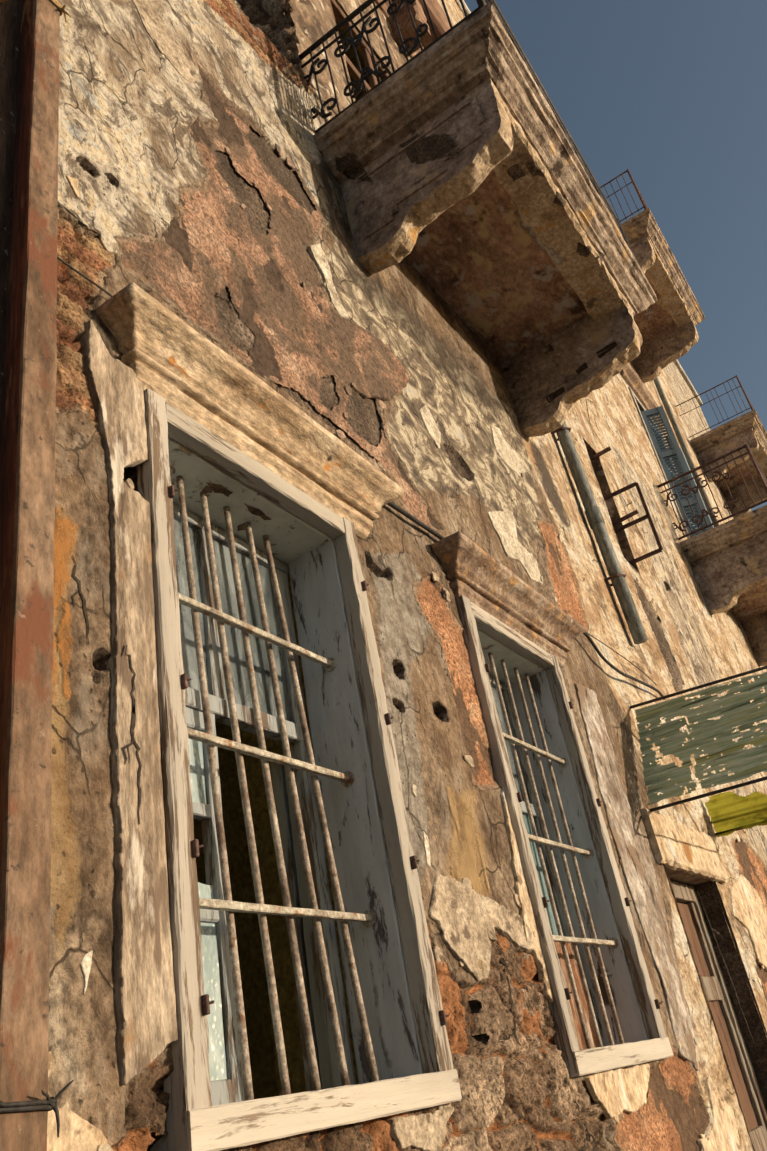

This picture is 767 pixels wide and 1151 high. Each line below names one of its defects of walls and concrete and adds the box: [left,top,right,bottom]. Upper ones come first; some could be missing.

spalling [55,0,444,535]
crack [72,555,90,643]
crack [125,645,142,824]
spalling [220,572,743,1151]
peeling [730,833,767,1007]
spalling [47,1045,174,1151]